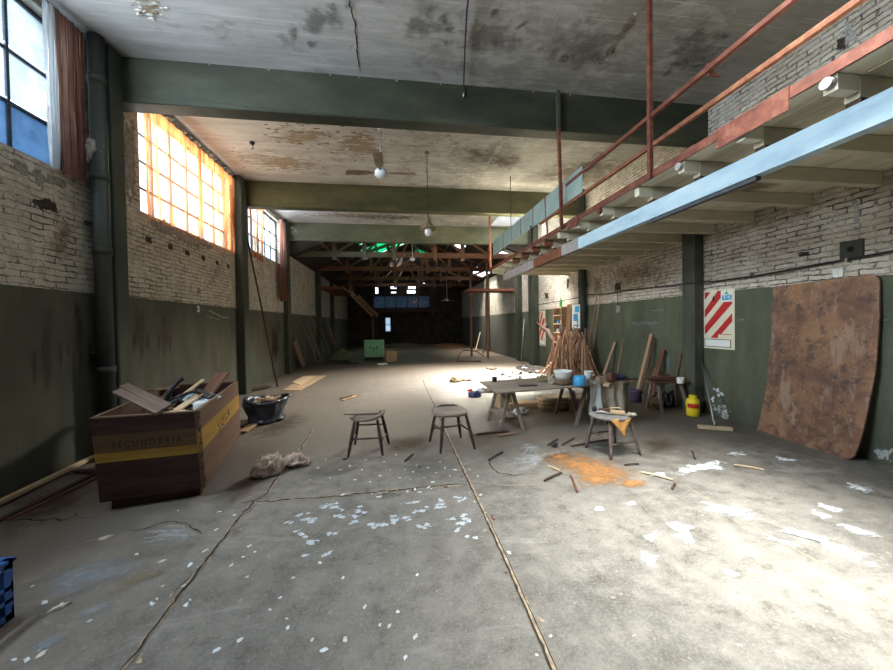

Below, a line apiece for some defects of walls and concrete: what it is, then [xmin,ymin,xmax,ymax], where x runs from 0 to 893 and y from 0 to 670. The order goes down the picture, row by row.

peeling [128,0,169,21]
crack [348,0,361,70]
peeling [164,115,392,178]
water stain [469,136,520,179]
spalling [32,198,59,213]
crack [2,381,560,670]